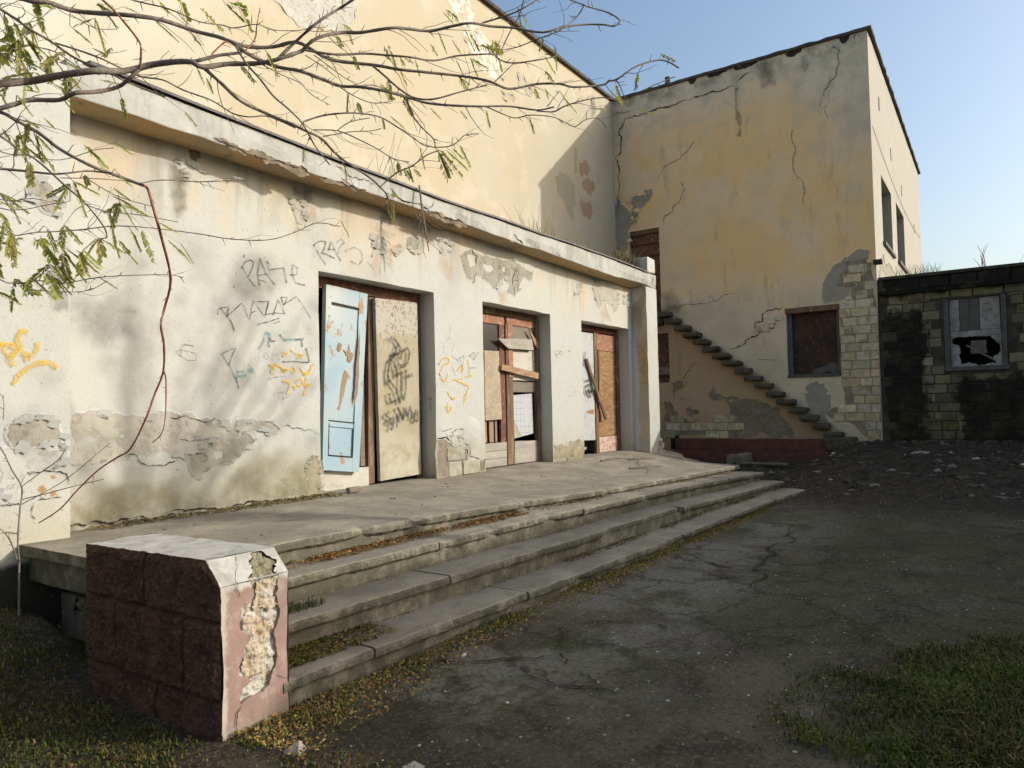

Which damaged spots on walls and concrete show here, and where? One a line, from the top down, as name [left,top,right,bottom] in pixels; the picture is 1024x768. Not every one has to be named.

spalling [218,138,367,191]
crack [613,71,753,220]
flaking render [615,187,654,256]
flaking render [369,232,534,297]
flaking render [821,248,896,304]
crack [731,307,783,360]
flaking render [708,384,795,439]
flaking render [802,379,832,422]
flaking render [0,409,280,505]
spalling [239,552,278,701]